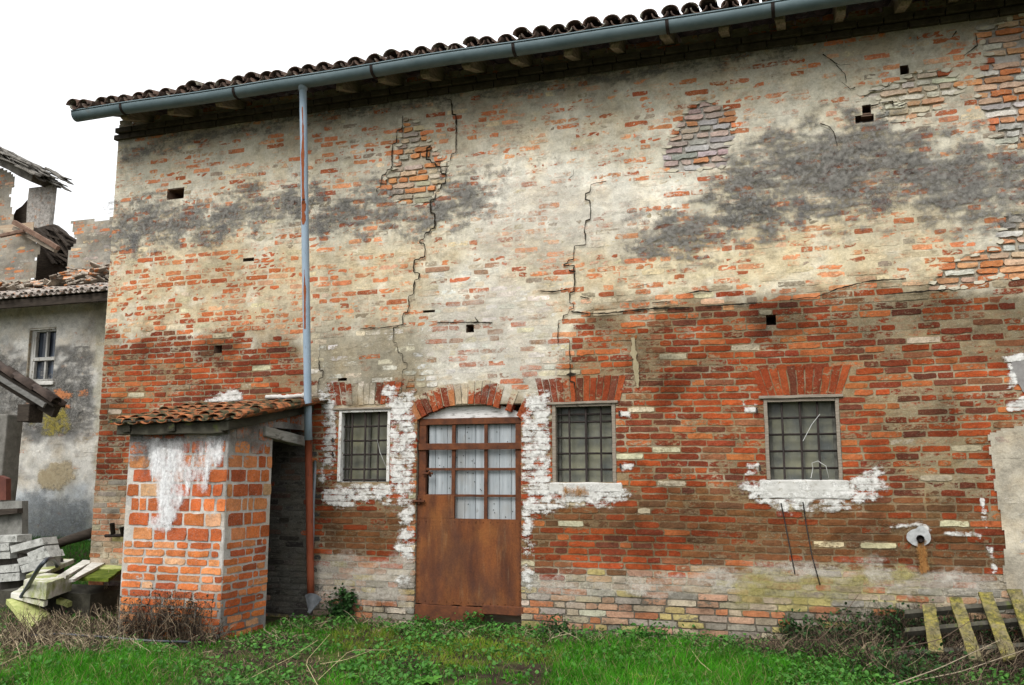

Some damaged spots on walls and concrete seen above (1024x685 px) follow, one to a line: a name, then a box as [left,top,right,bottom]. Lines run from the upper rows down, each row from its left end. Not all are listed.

leakage [101,164,521,262]
crack [361,99,457,394]
crack [541,170,762,407]
spalling [661,99,738,173]
leakage [613,103,1024,266]
crack [790,278,951,300]
spalling [856,13,1024,149]
spalling [929,213,1024,290]
leakage [136,436,223,531]
peeling [318,385,416,559]
peeling [522,390,629,553]
peeling [740,463,888,512]